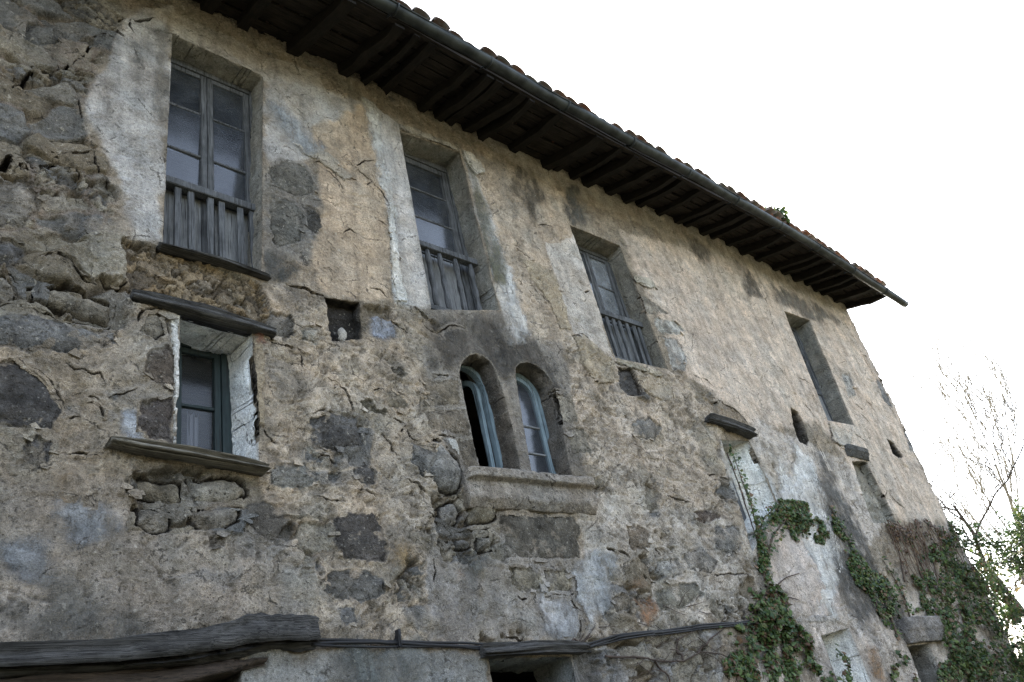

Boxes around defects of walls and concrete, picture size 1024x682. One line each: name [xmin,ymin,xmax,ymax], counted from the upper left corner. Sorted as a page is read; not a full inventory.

spalling [17,17,66,51]
spalling [0,156,180,473]
crack [264,158,469,340]
spalling [116,363,583,599]